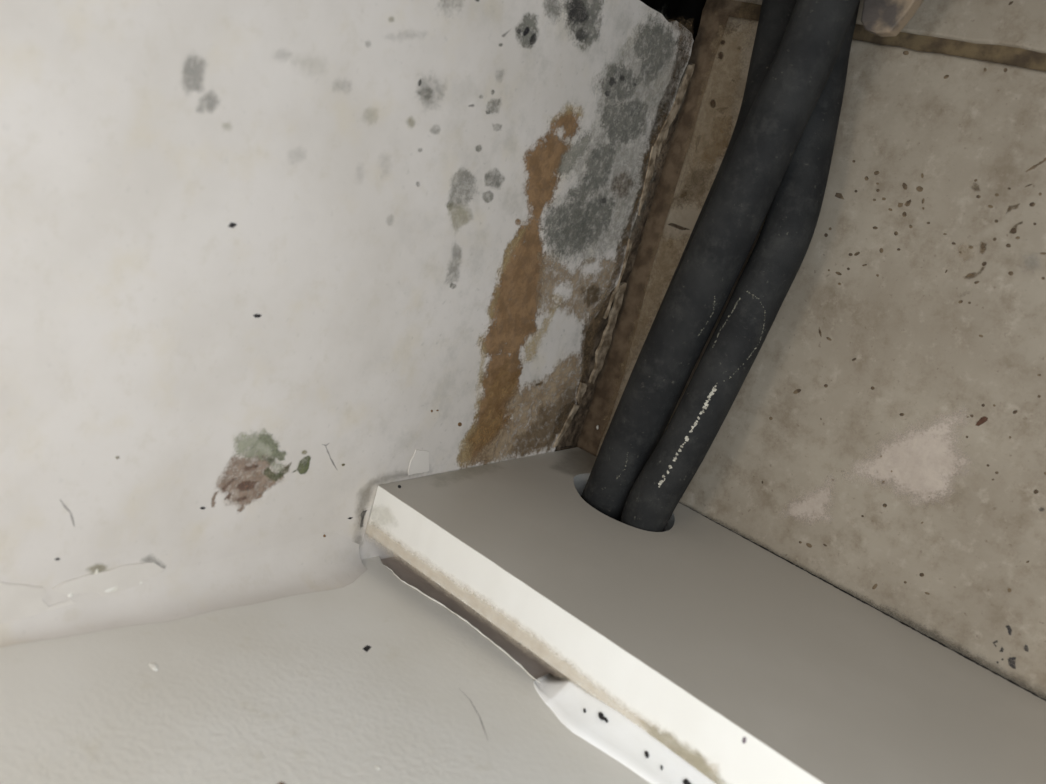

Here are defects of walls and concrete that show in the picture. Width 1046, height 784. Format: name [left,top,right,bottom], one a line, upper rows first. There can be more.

damp [516,0,602,49]
corrosion [457,109,579,468]
damp [468,23,674,463]